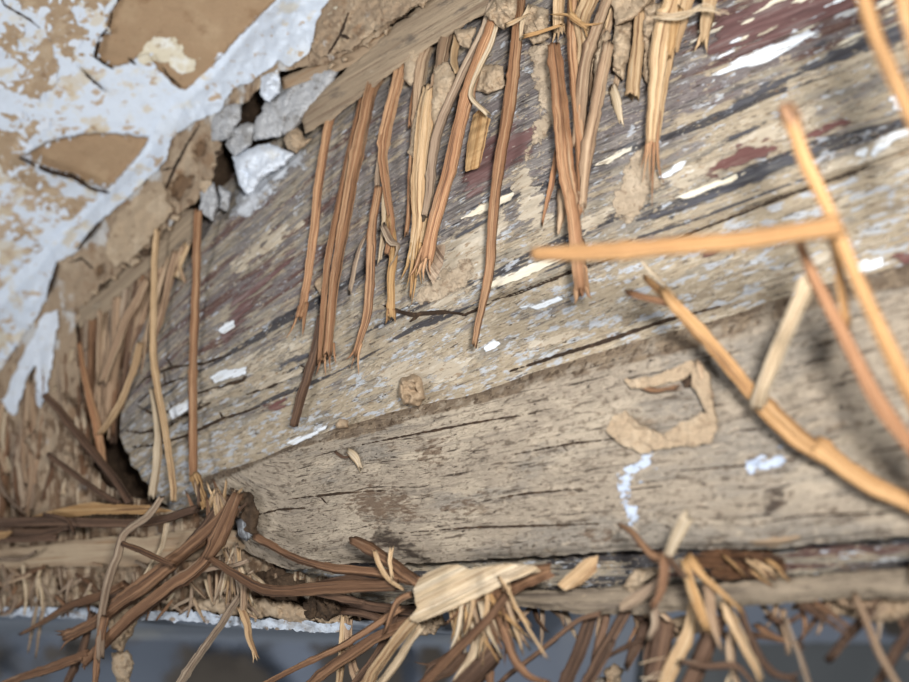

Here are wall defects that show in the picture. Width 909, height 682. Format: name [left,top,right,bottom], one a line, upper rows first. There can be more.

flaking render [0,0,275,220]
peeling [5,218,41,254]
peeling [1,310,59,415]
spalling [681,373,692,388]
peeling [0,606,99,620]
peeling [138,609,352,633]